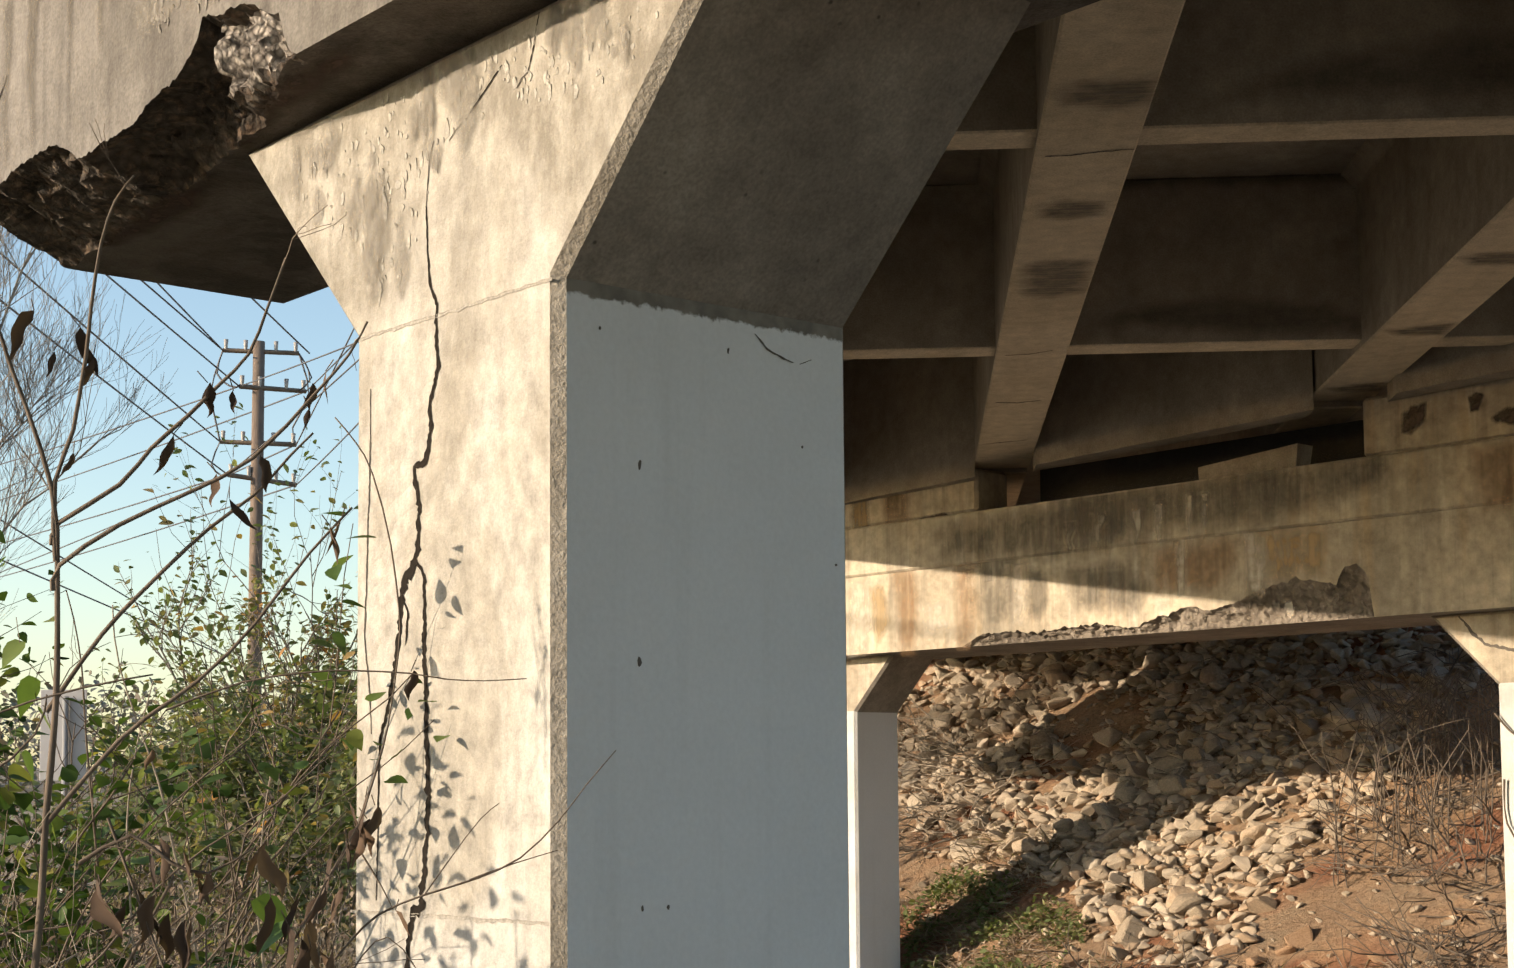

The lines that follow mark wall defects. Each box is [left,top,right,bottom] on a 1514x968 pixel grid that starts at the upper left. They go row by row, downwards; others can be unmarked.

spalling [0,0,307,269]
damp [1398,326,1447,334]
crack [364,12,540,968]
damp [948,460,1384,623]